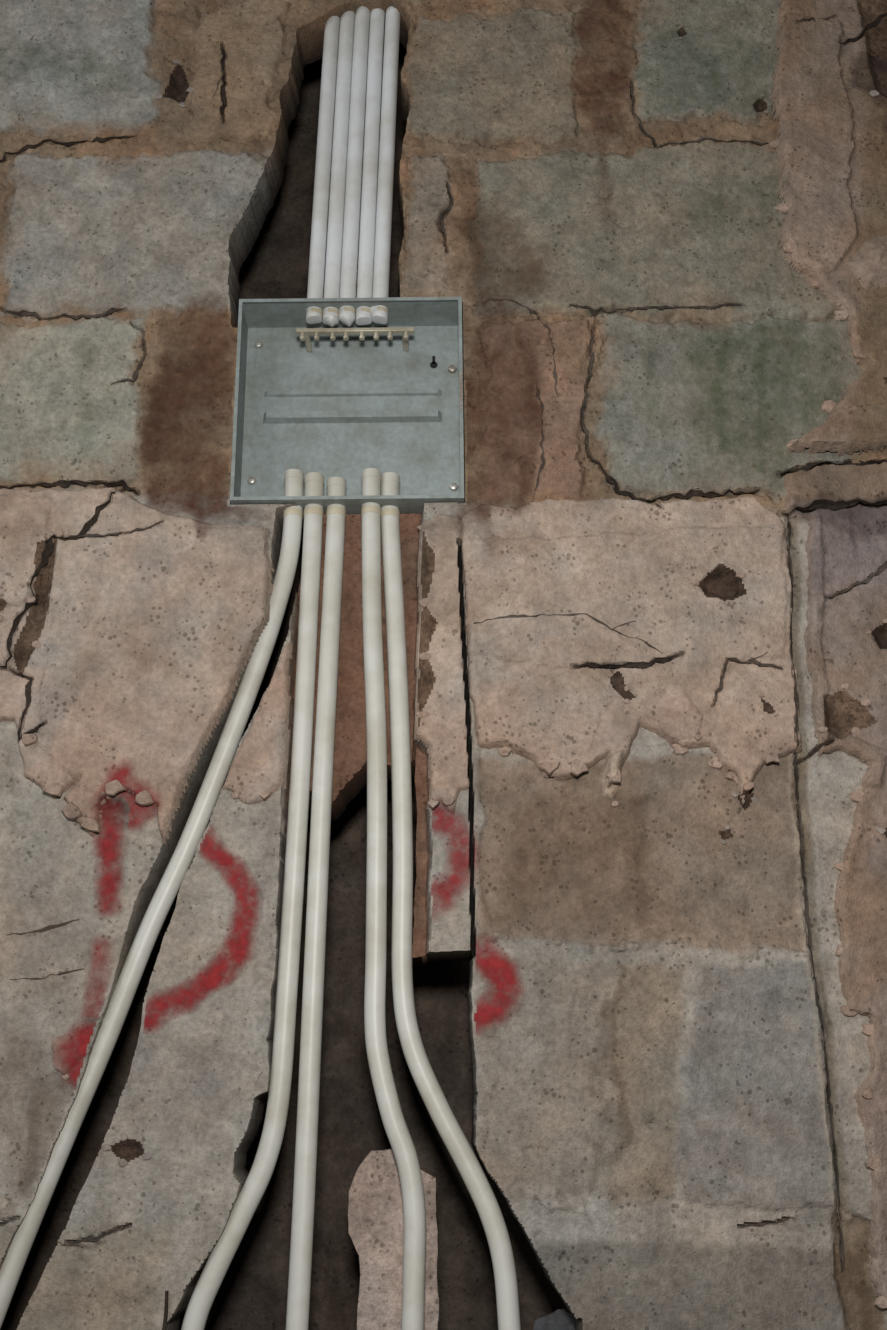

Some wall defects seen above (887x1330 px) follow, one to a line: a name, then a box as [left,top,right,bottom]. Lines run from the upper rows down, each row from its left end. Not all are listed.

crack [0,480,163,741]
flaking render [0,487,275,845]
flaking render [220,642,293,805]
flaking render [414,0,887,1309]
crack [464,298,887,1271]
crack [7,919,80,935]
crack [9,968,84,980]